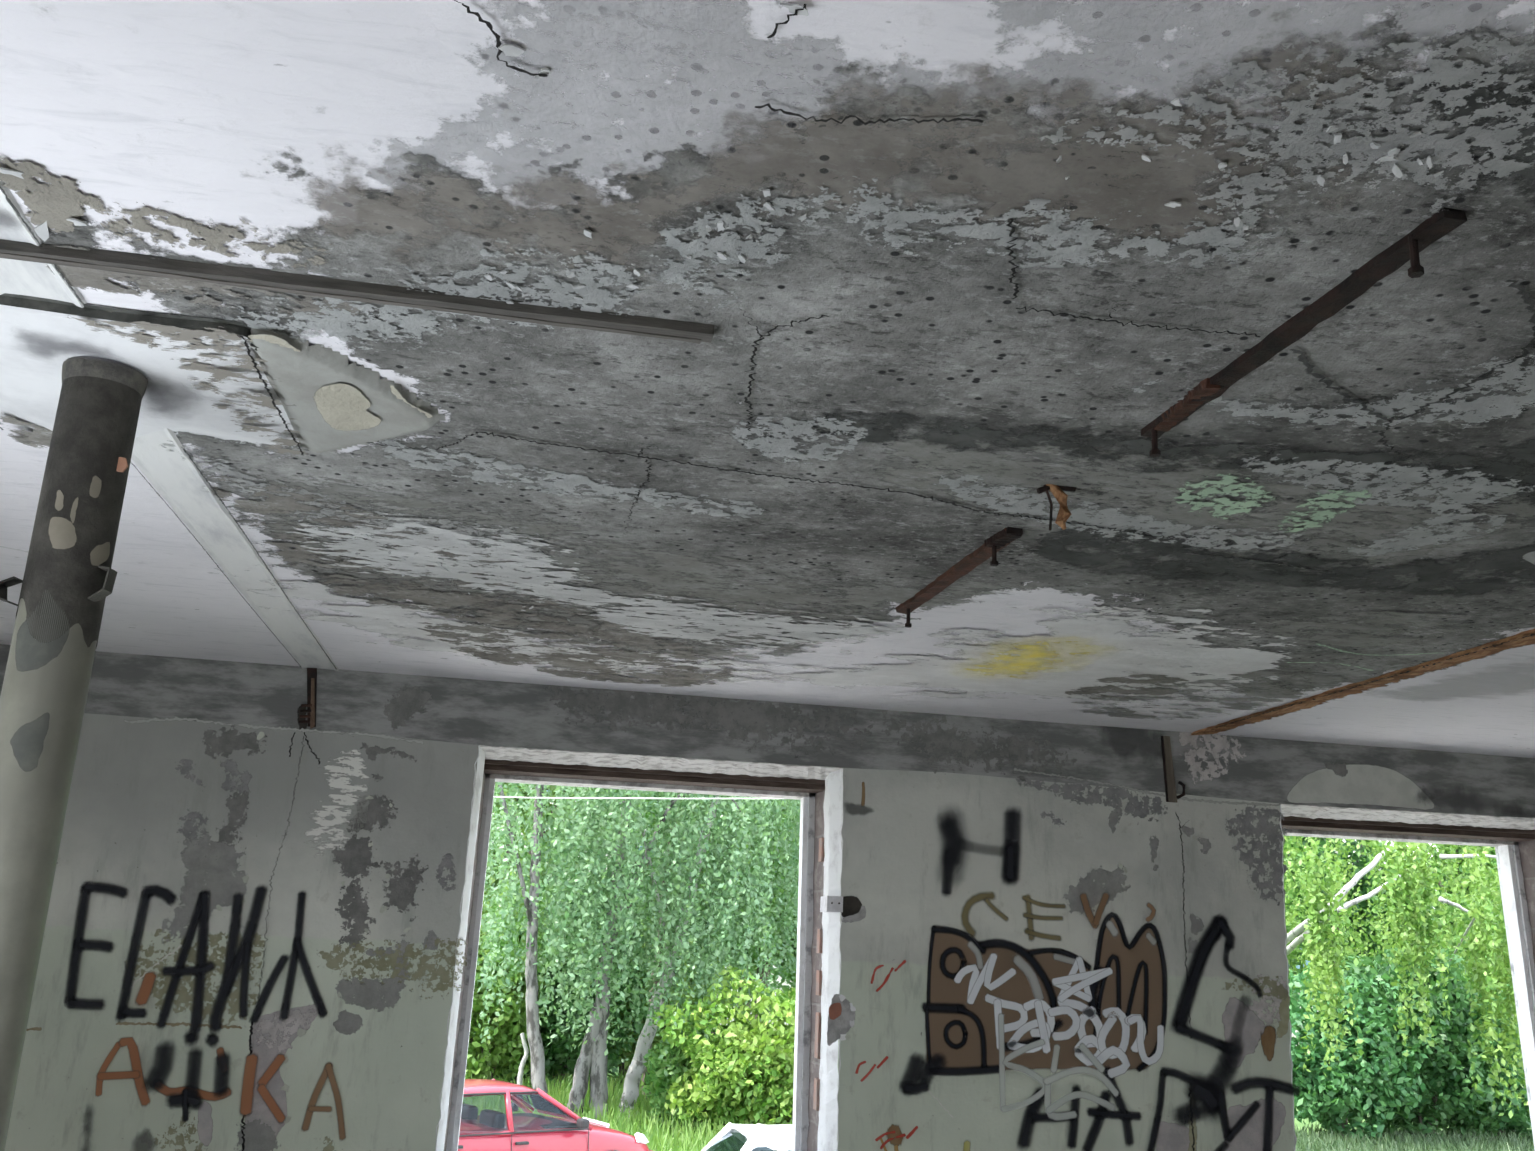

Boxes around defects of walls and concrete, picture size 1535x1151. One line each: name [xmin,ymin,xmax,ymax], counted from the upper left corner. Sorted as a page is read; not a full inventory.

crack [454,0,548,77]
peeling [0,156,361,455]
crack [739,308,829,431]
water stain [36,13,1535,703]
corrosion [1154,378,1221,432]
crack [1006,218,1535,469]
crack [367,432,1361,578]
peeling [876,433,1535,561]
peeling [208,475,1011,757]
corrosion [1204,634,1535,734]
peeling [125,685,467,1151]
peeling [1225,805,1290,906]